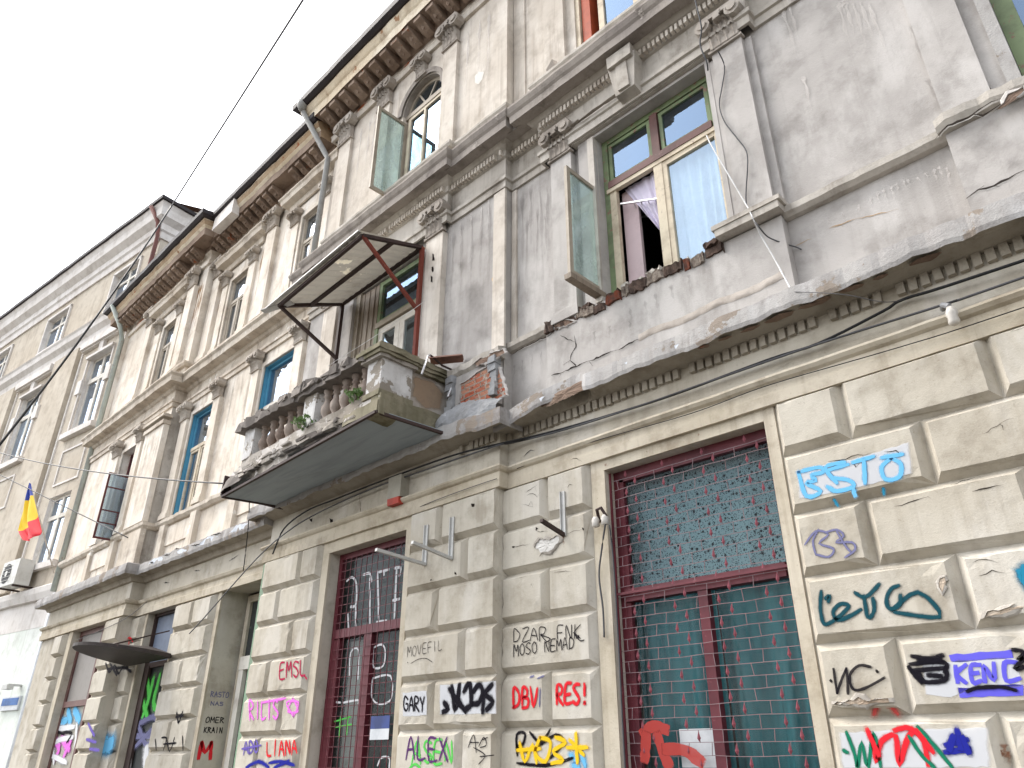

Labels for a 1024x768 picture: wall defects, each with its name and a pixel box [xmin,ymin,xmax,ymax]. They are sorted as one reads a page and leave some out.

crack [935,88,1001,139]
crack [967,170,1024,198]
crack [513,333,639,377]
flaking render [458,348,509,404]
flaking render [539,381,583,407]
flaking render [534,534,564,556]
flaking render [978,603,1023,620]
flaking render [831,692,895,710]